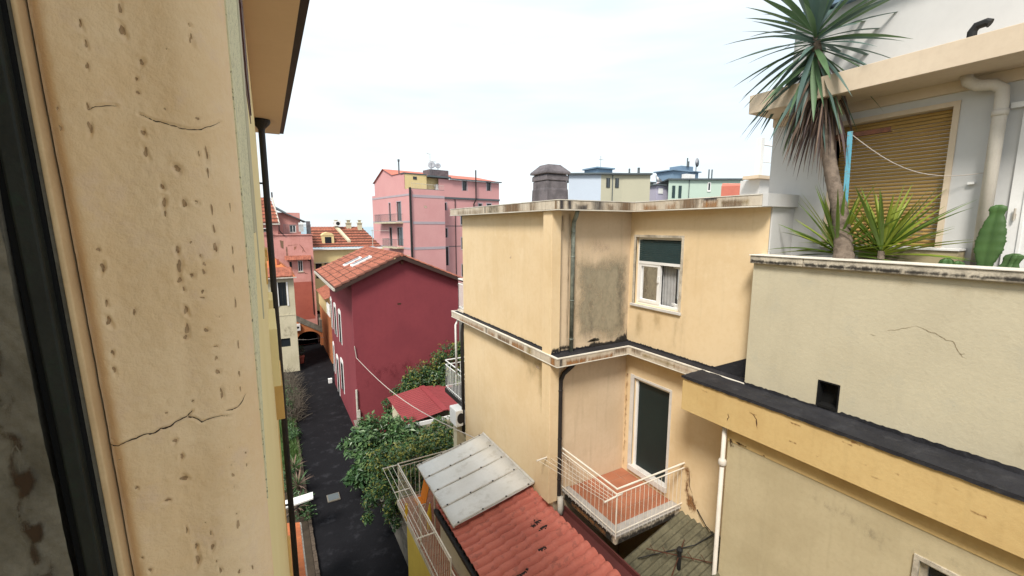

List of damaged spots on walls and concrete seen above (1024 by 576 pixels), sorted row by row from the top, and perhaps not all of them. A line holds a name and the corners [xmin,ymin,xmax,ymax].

crack [143,115,220,130]
leakage [580,262,648,357]
crack [111,396,245,446]
corrosion [685,468,696,511]